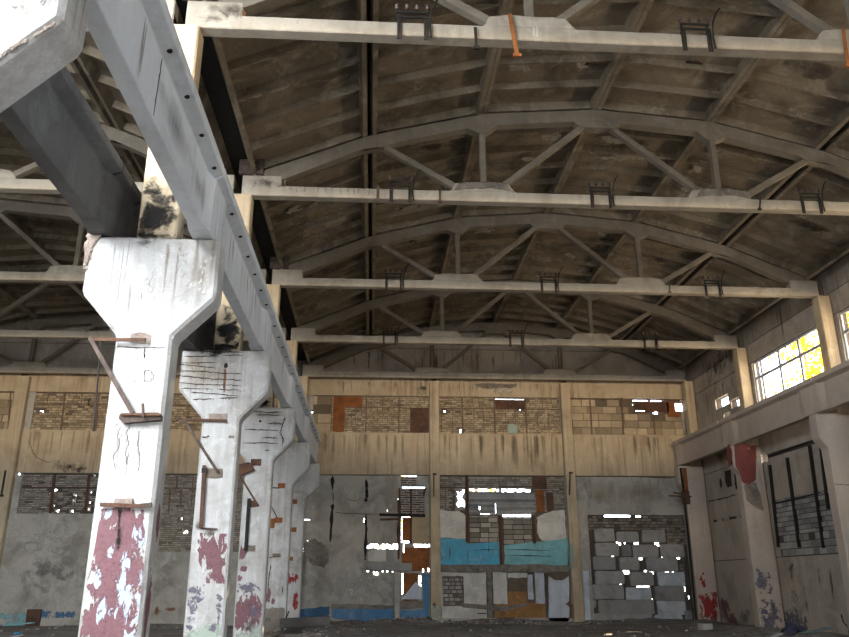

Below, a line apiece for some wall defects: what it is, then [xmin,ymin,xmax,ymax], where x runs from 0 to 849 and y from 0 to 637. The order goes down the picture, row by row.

crack [117,346,165,384]
crack [179,350,242,401]
crack [113,424,141,475]
crack [245,411,286,451]
peeling [719,443,764,511]
peeling [41,502,175,637]
peeling [186,533,227,637]
peeling [235,546,298,632]
spalling [303,538,329,568]
peeling [699,572,737,624]
peeling [755,569,808,630]